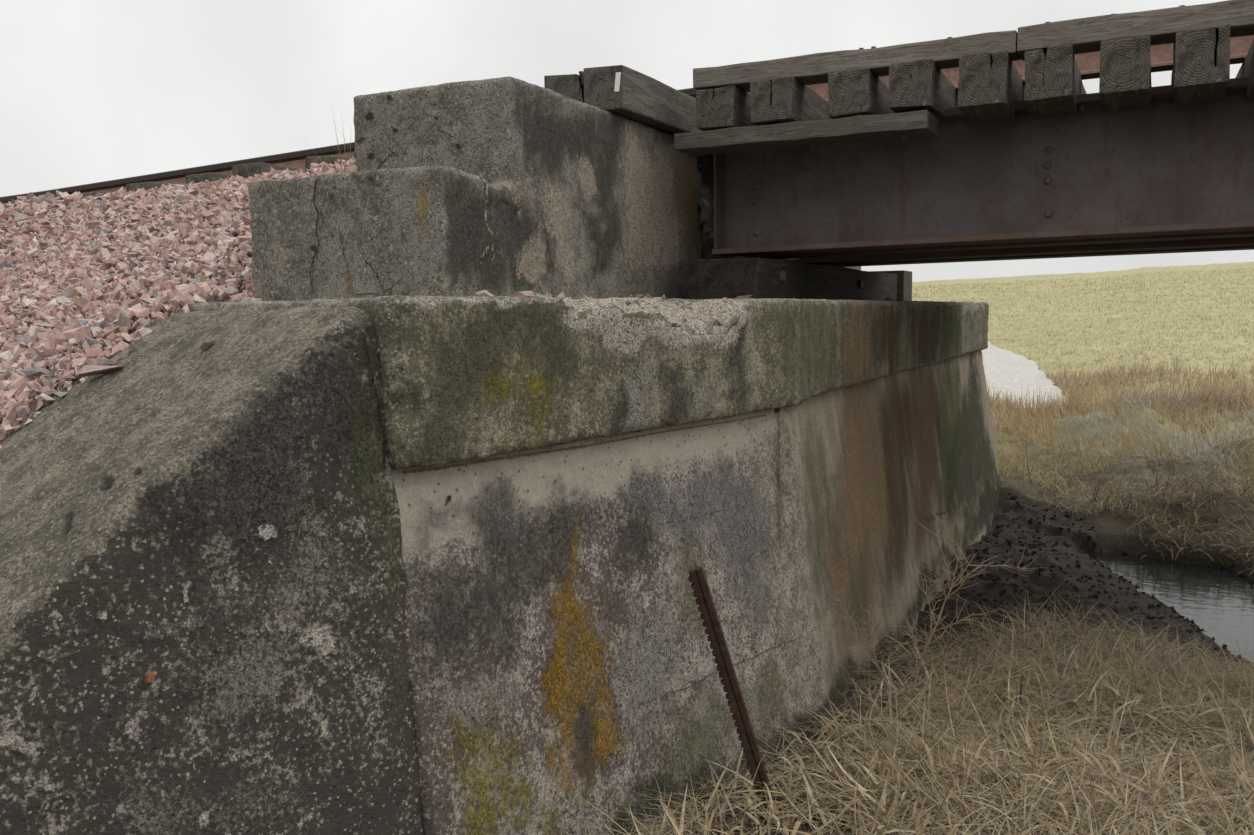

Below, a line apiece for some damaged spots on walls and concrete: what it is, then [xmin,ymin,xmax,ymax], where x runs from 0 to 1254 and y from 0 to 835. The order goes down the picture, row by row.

crack [306,178,400,296]
damp [395,171,555,309]
damp [516,81,622,273]
damp [415,478,625,794]
damp [611,353,1001,835]